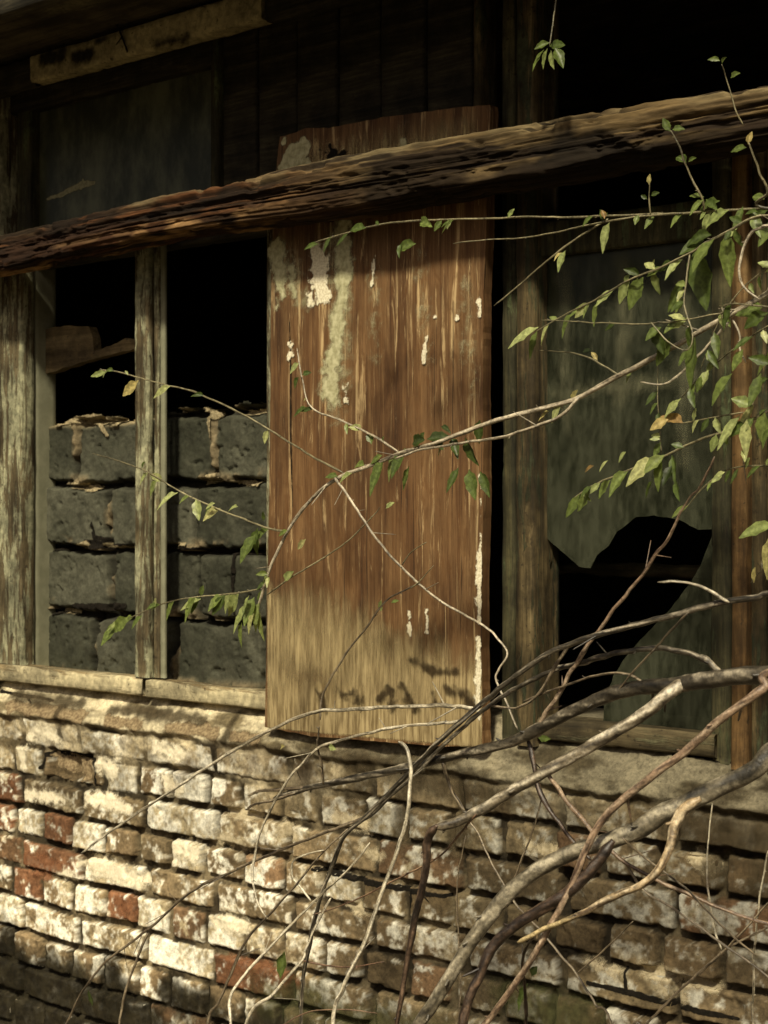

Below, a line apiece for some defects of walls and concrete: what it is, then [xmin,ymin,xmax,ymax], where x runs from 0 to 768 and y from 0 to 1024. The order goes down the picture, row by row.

peeling [278,136,324,170]
peeling [267,220,355,407]
leakage [11,690,85,738]
leakage [108,704,207,724]
leakage [219,715,238,745]
leakage [267,593,497,858]
peeling [473,636,482,720]
leakage [661,811,768,904]
leakage [0,923,308,1024]
leakage [498,991,601,1024]